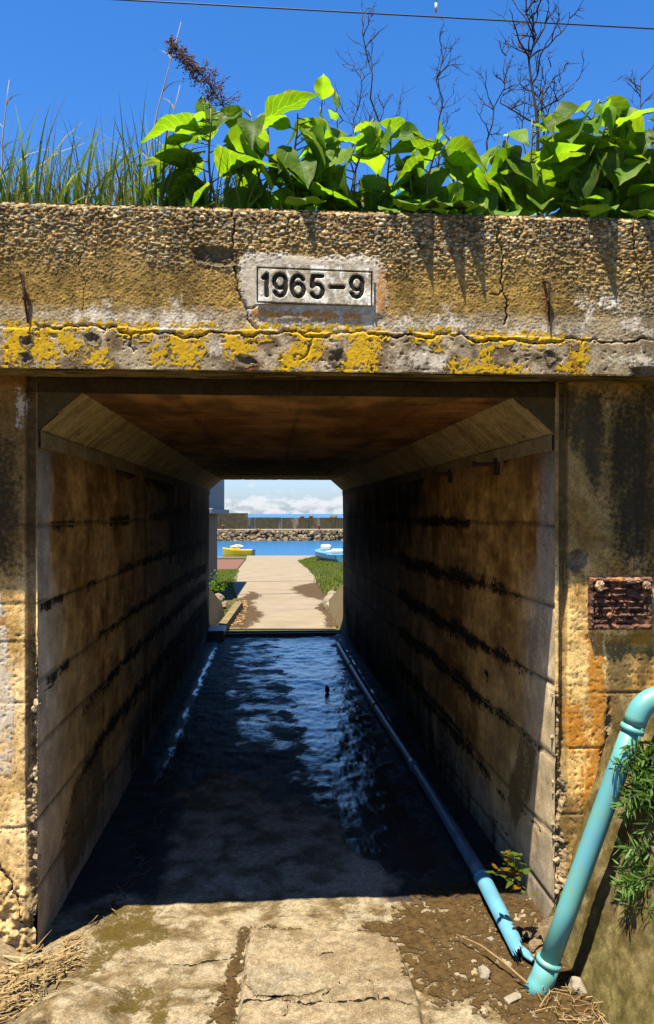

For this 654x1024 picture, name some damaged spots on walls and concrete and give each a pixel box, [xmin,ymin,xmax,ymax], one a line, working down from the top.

rust [18,270,30,330]
crack [38,207,654,360]
rust [543,279,551,328]
damp [560,384,654,578]
damp [40,595,63,612]
rust [624,577,651,590]
damp [46,658,70,685]
damp [52,468,209,888]
damp [288,583,543,826]
spalling [550,691,569,905]
crack [241,978,413,1016]